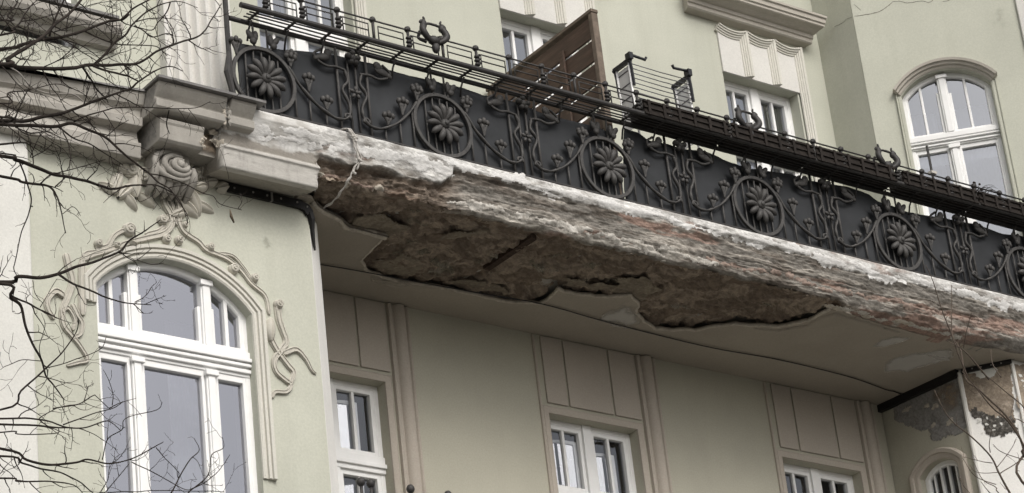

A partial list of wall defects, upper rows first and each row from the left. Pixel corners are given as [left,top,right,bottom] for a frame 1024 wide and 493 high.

flaking render [246,122,1024,340]
flaking render [893,364,1024,441]